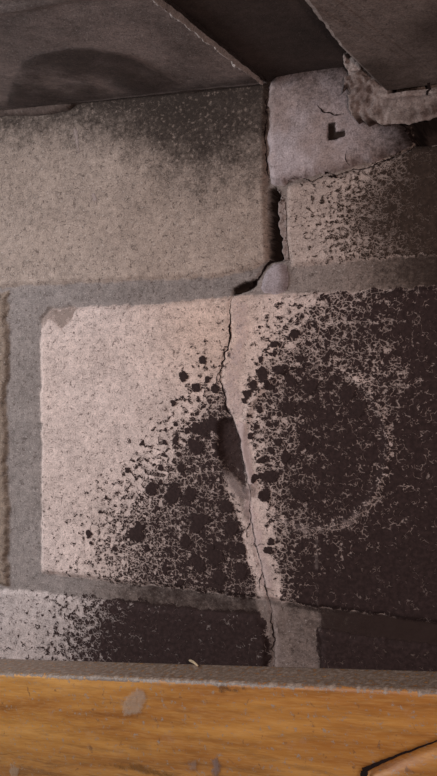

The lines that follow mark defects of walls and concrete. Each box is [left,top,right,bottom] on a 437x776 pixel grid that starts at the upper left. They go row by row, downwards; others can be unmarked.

damp [7,50,258,109]
damp [42,124,437,624]
crack [215,260,276,666]
damp [0,590,279,666]
damp [316,627,437,671]